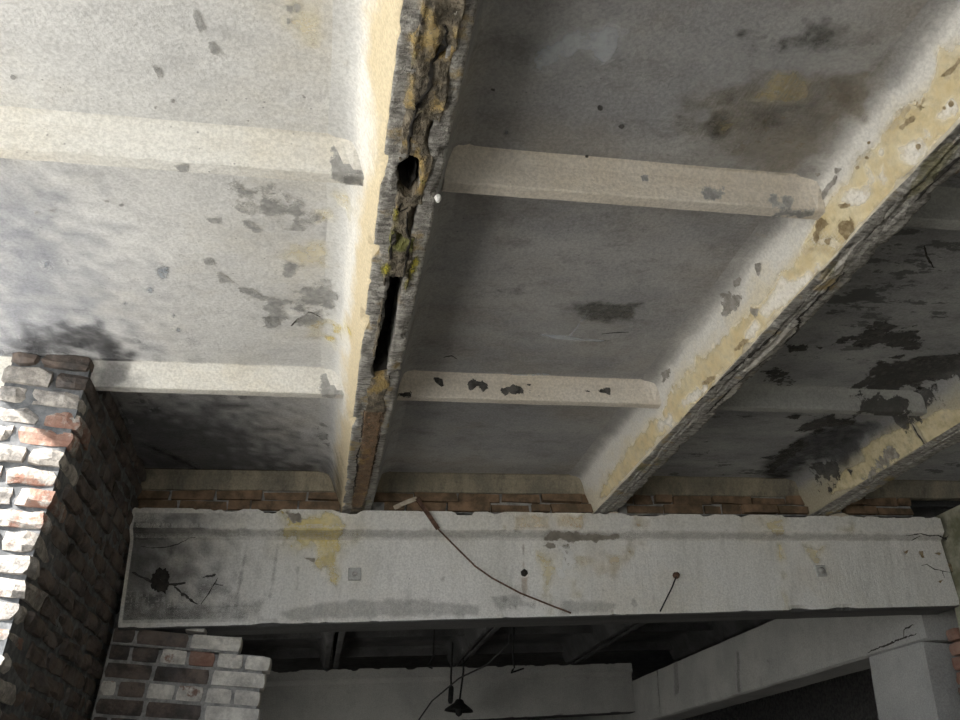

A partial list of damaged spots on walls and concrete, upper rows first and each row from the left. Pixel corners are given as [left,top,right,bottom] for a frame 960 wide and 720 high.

peeling [330,146,364,186]
spalling [397,154,416,189]
peeling [768,194,854,245]
leakage [601,50,960,497]
spalling [373,276,398,372]
leakage [579,303,642,321]
peeling [468,378,488,392]
peeling [500,384,531,396]
peeling [761,319,960,473]
crack [906,533,948,541]
crack [132,572,223,605]
crack [868,624,916,653]